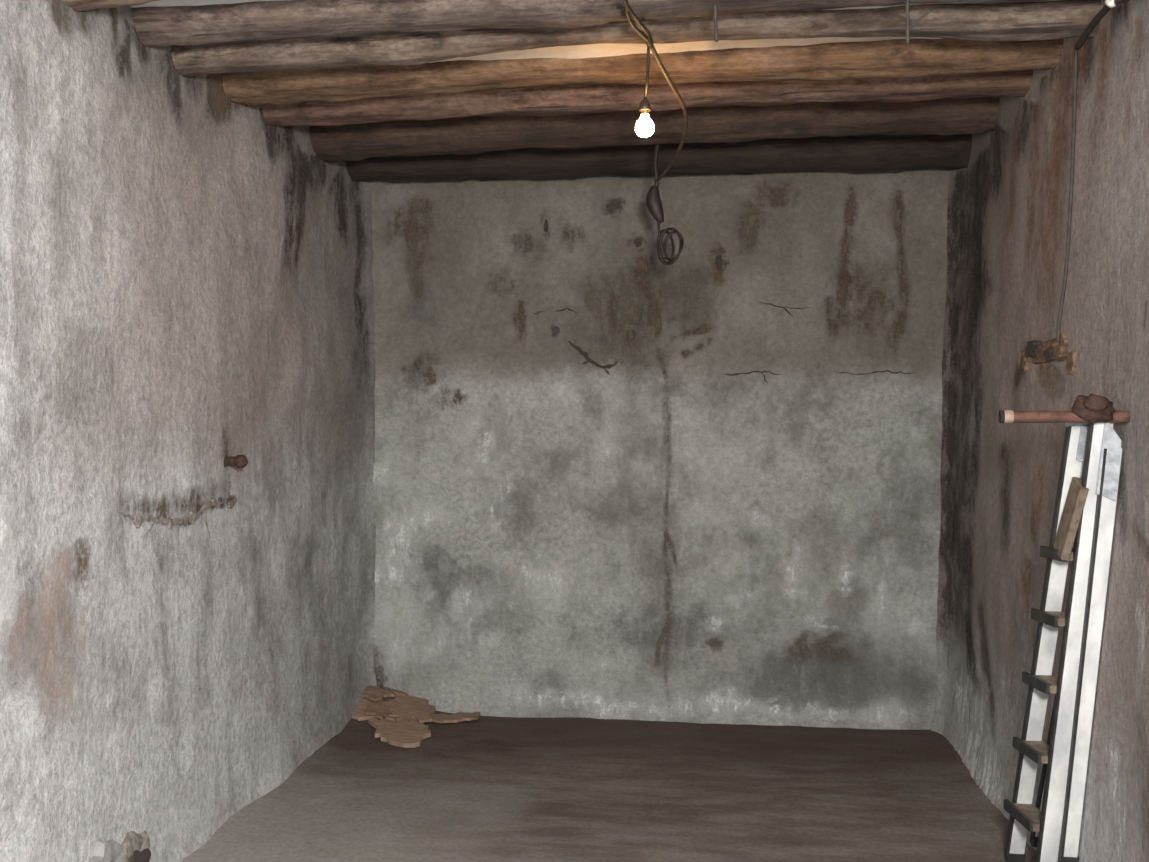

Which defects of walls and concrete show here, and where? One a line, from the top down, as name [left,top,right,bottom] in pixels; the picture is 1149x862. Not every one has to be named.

water stain [260,108,368,366]
water stain [826,188,907,338]
water stain [403,358,464,404]
crack [533,307,620,376]
crack [720,371,784,383]
crack [757,301,811,318]
crack [831,368,918,376]
water stain [939,100,1033,728]
water stain [1119,468,1149,556]
crack [656,534,676,662]
water stain [671,618,907,720]
spalling [88,831,151,862]